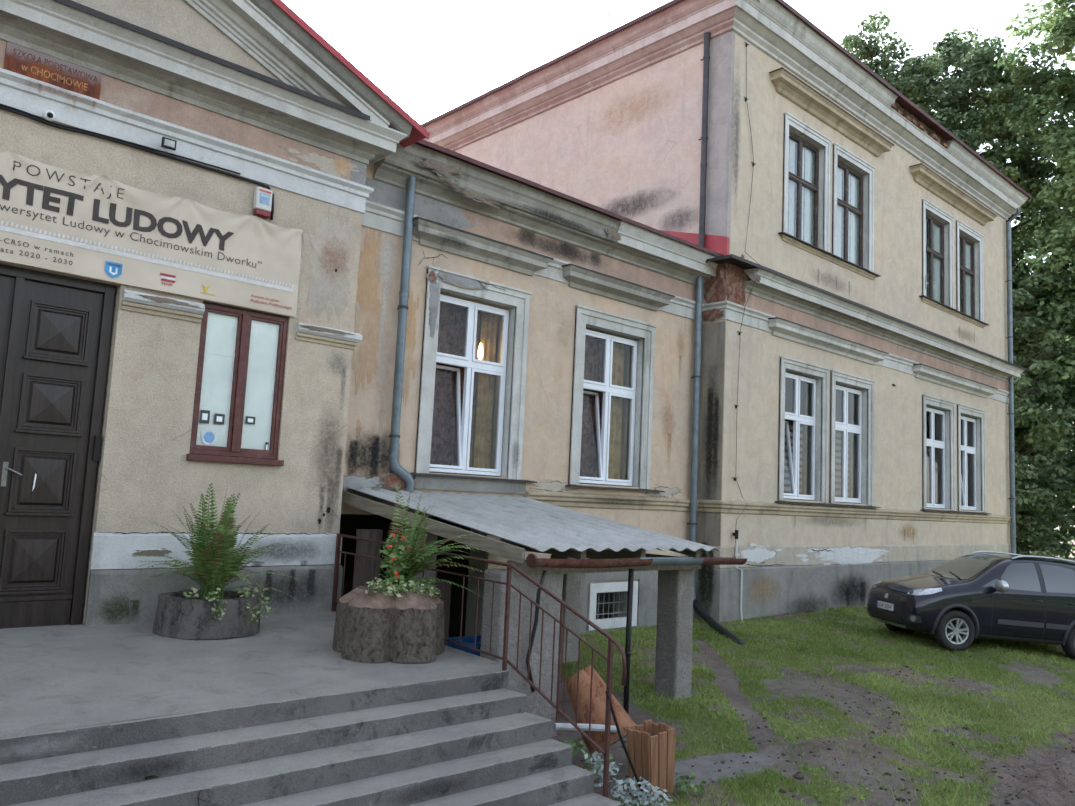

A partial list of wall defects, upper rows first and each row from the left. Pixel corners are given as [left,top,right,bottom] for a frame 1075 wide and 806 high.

flaking render [702,254,761,322]
water stain [348,412,392,477]
water stain [705,391,719,475]
peeling [733,543,783,564]
peeling [796,547,890,565]